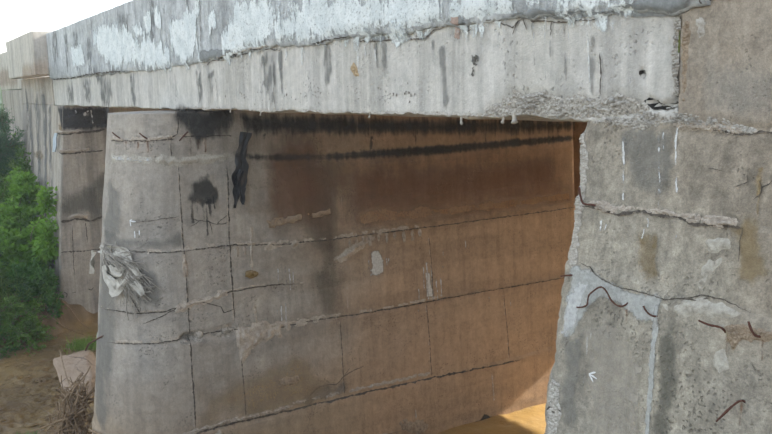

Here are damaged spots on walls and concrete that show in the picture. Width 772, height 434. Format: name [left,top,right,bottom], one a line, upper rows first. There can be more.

water stain [450,15,475,39]
spalling [299,88,758,277]
crack [579,262,749,312]
spalling [546,372,562,434]